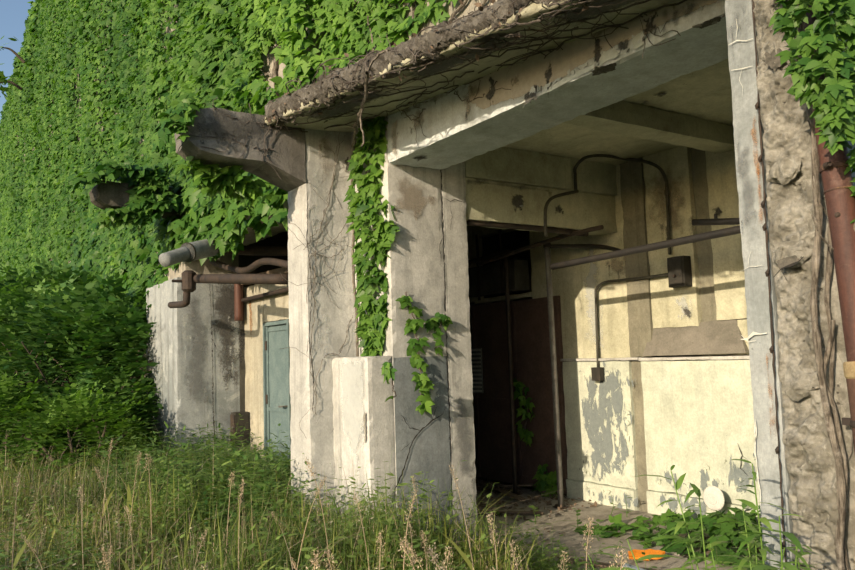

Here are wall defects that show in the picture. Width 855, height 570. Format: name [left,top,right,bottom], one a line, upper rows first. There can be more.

flaking render [468,0,726,109]
damp [189,284,245,399]
crack [395,170,465,489]
peeling [579,361,638,508]